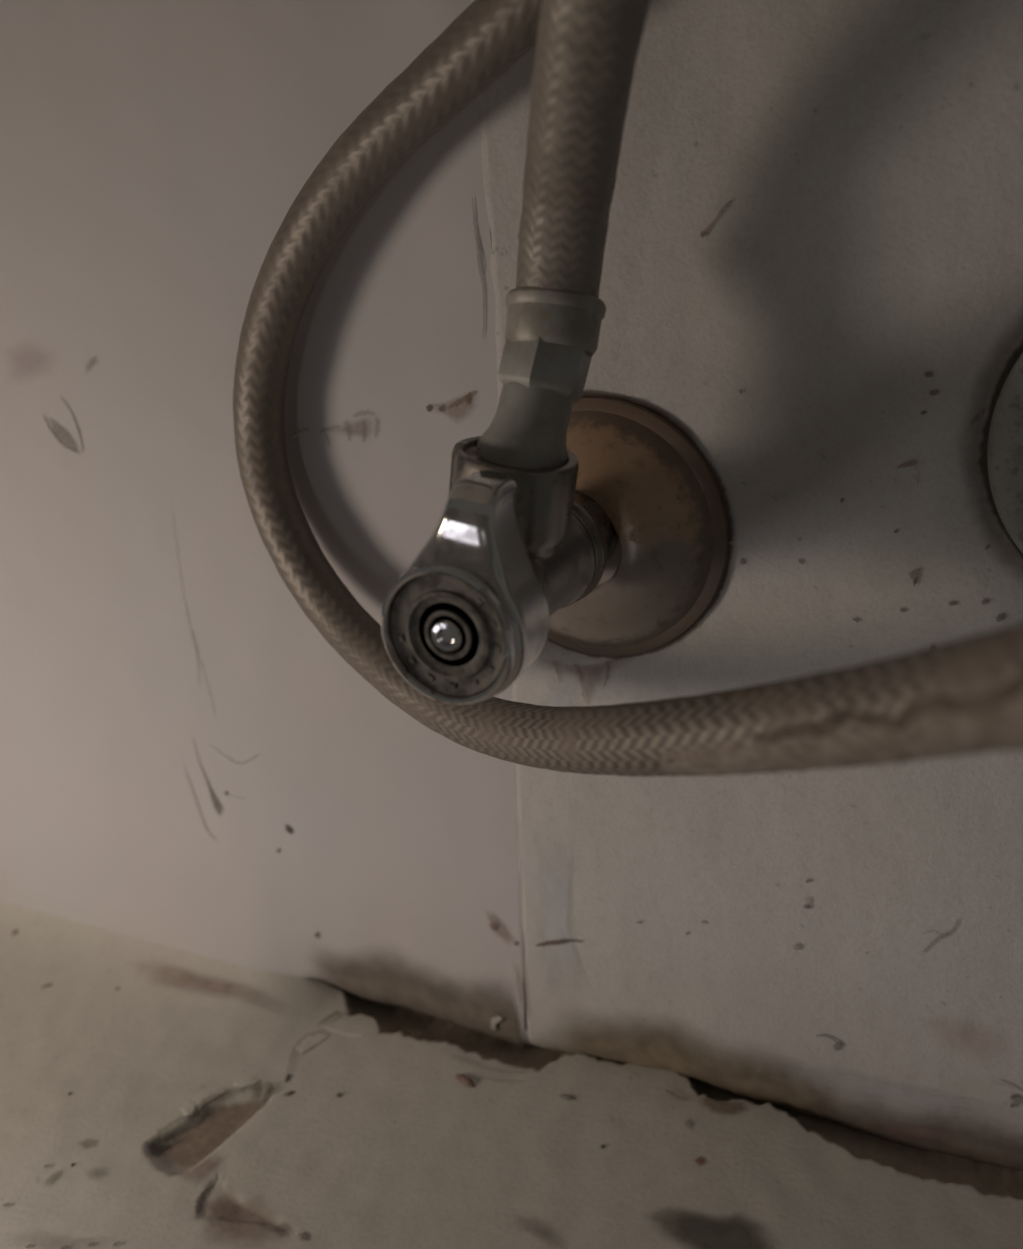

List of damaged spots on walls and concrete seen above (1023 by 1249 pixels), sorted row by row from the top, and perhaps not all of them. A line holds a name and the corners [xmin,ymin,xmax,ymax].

rust [547,391,733,659]
spalling [294,1011,379,1054]
spalling [152,1078,288,1235]